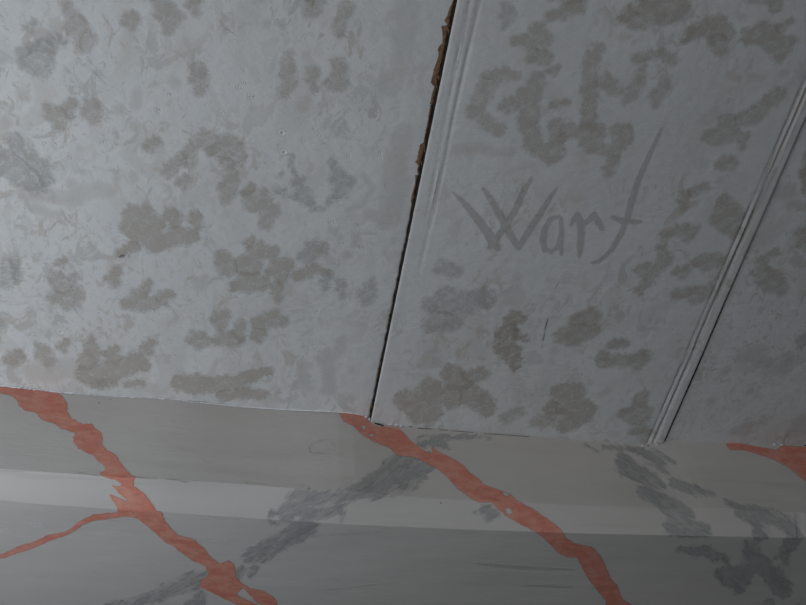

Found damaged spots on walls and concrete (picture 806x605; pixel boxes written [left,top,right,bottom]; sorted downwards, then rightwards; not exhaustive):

damp [117,204,201,256]
damp [172,368,272,401]